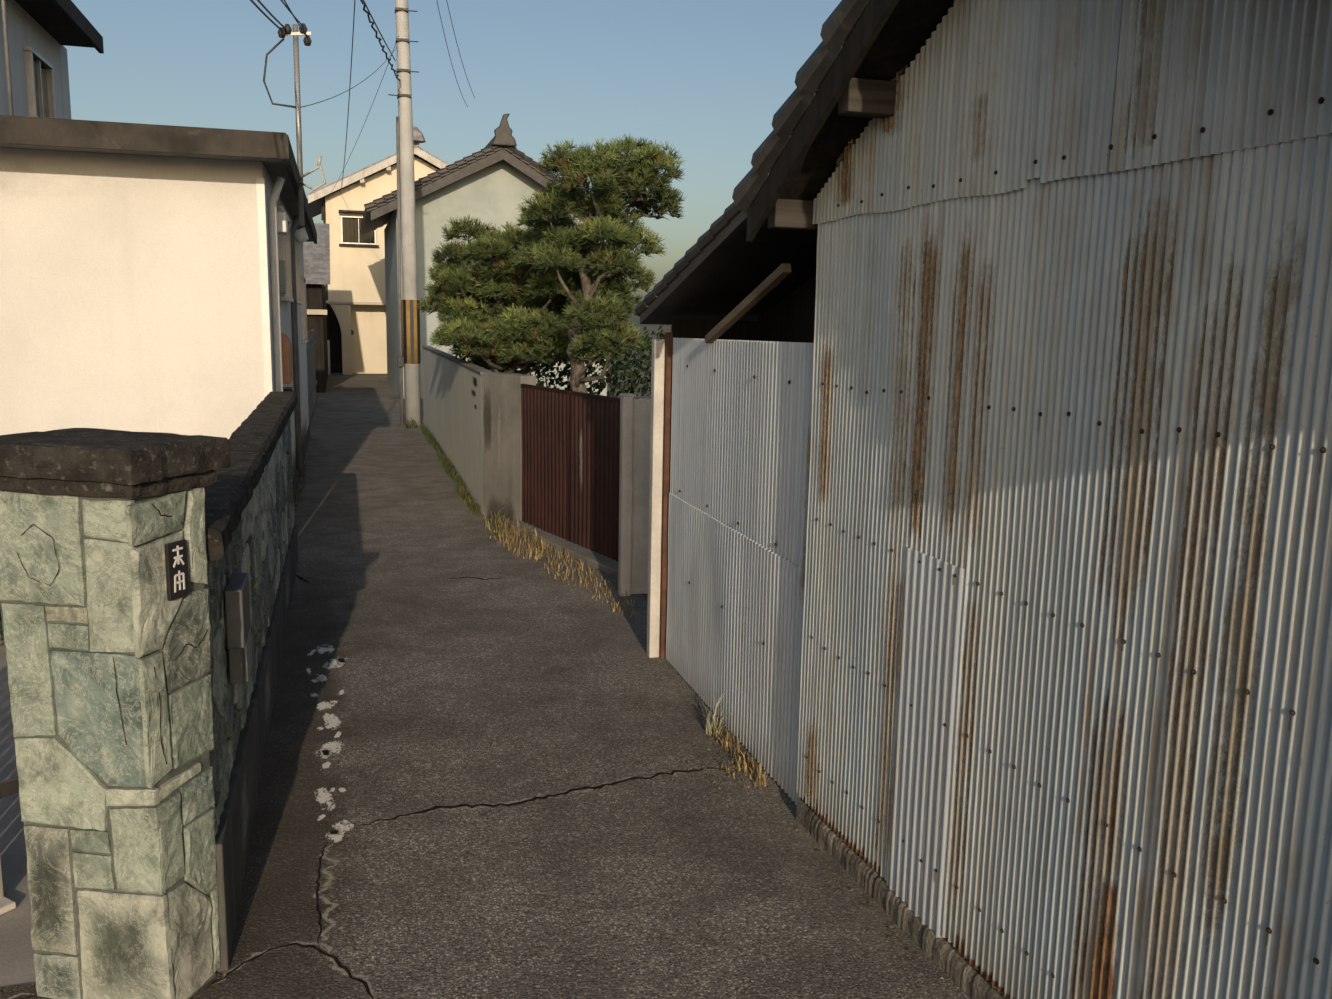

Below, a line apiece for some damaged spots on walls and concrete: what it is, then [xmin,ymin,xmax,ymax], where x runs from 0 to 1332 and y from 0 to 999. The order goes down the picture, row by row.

rust [893,243,942,536]
rust [944,251,991,522]
rust [1101,201,1175,650]
crack [207,767,734,999]
rust [803,577,905,873]
rust [952,617,977,885]
rust [955,936,1010,999]
rust [1073,695,1130,999]
rust [1140,271,1241,999]